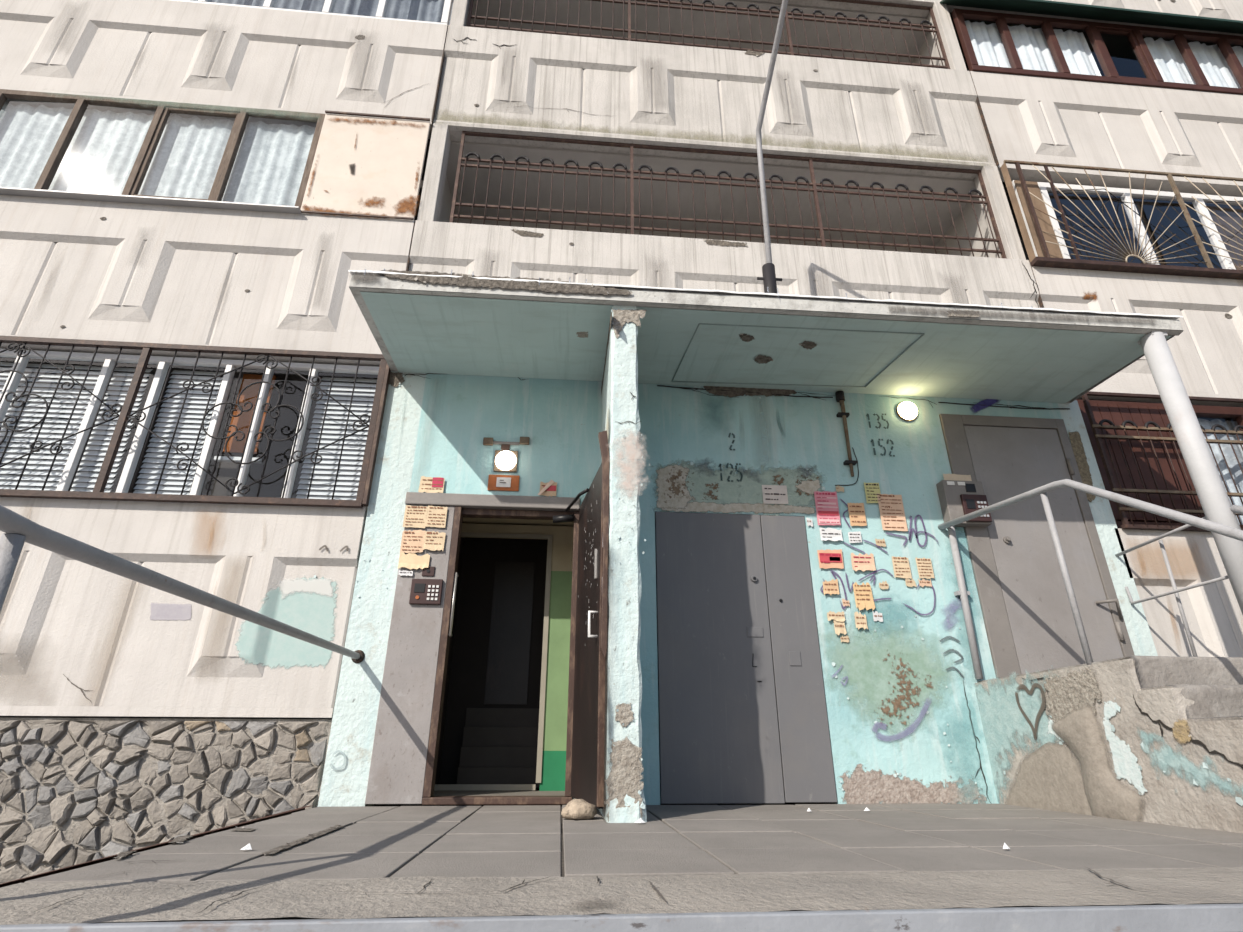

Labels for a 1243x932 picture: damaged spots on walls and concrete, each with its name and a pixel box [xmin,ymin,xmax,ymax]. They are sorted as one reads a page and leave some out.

corrosion [335,118,423,148]
corrosion [303,170,419,218]
peeling [380,269,825,516]
peeling [236,575,337,669]
spalling [605,703,645,821]
peeling [840,668,1243,806]
crack [1133,695,1243,769]
crack [34,859,281,913]
crack [647,880,667,902]